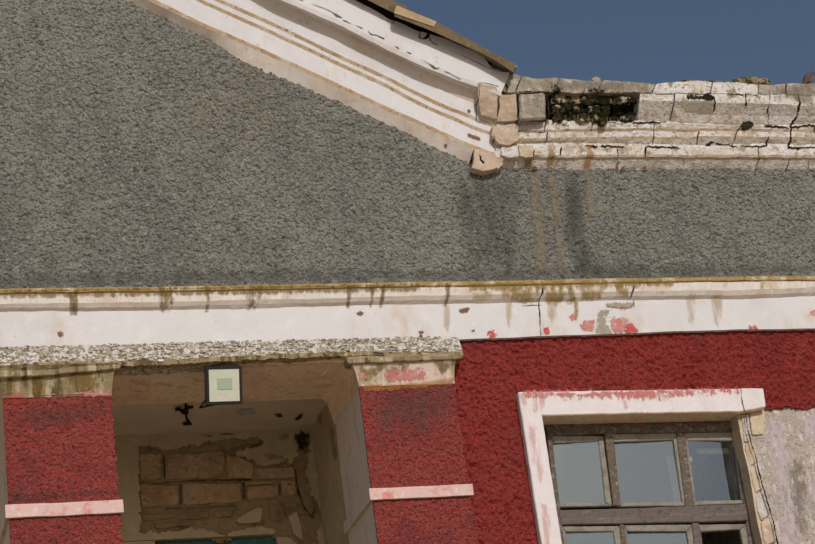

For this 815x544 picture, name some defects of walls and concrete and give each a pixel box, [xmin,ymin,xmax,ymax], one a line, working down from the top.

crack [302,0,550,168]
crack [706,95,815,171]
damp [4,283,420,307]
damp [471,280,673,319]
peeling [570,300,638,334]
peeling [384,367,426,382]
peeling [524,387,739,401]
crack [740,388,779,544]
peeling [138,435,322,544]